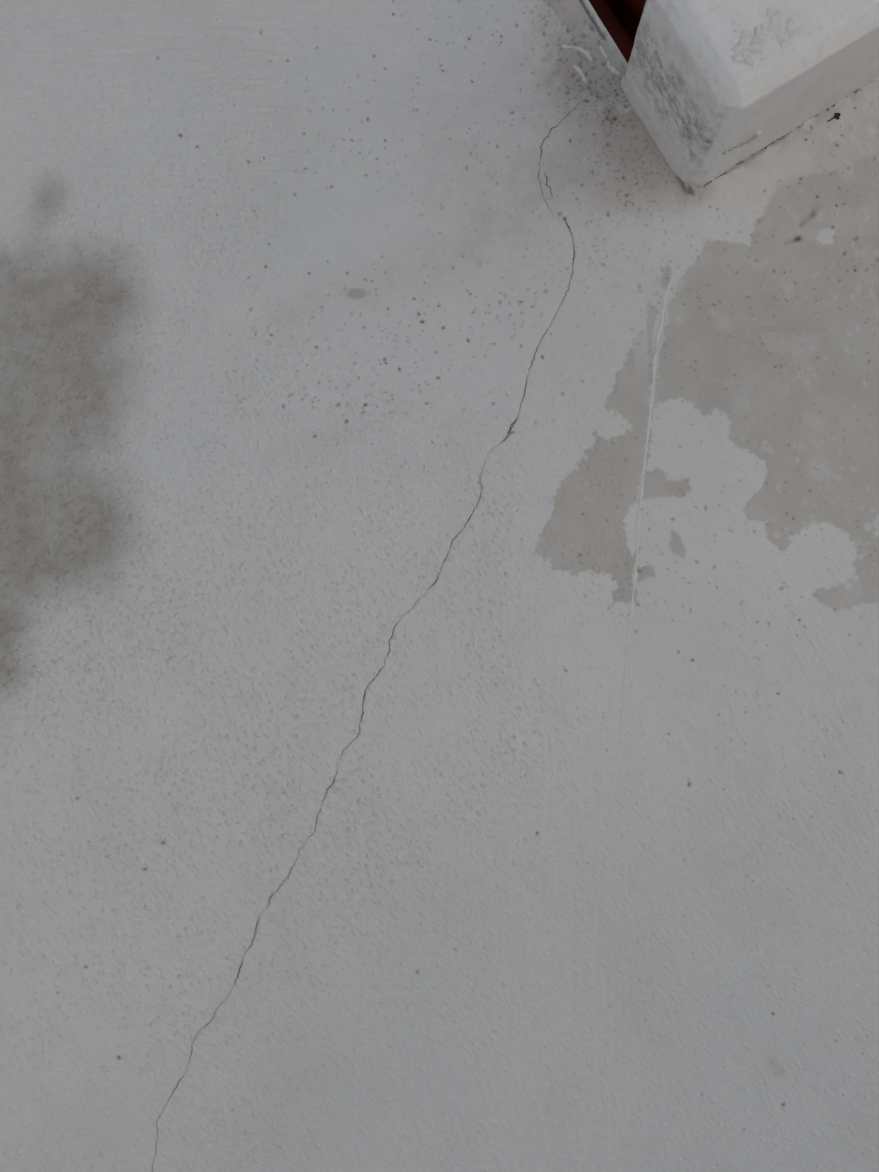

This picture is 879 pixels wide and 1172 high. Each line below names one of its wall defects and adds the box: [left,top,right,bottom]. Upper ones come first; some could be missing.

crack [152,102,580,1172]
water stain [532,94,879,614]